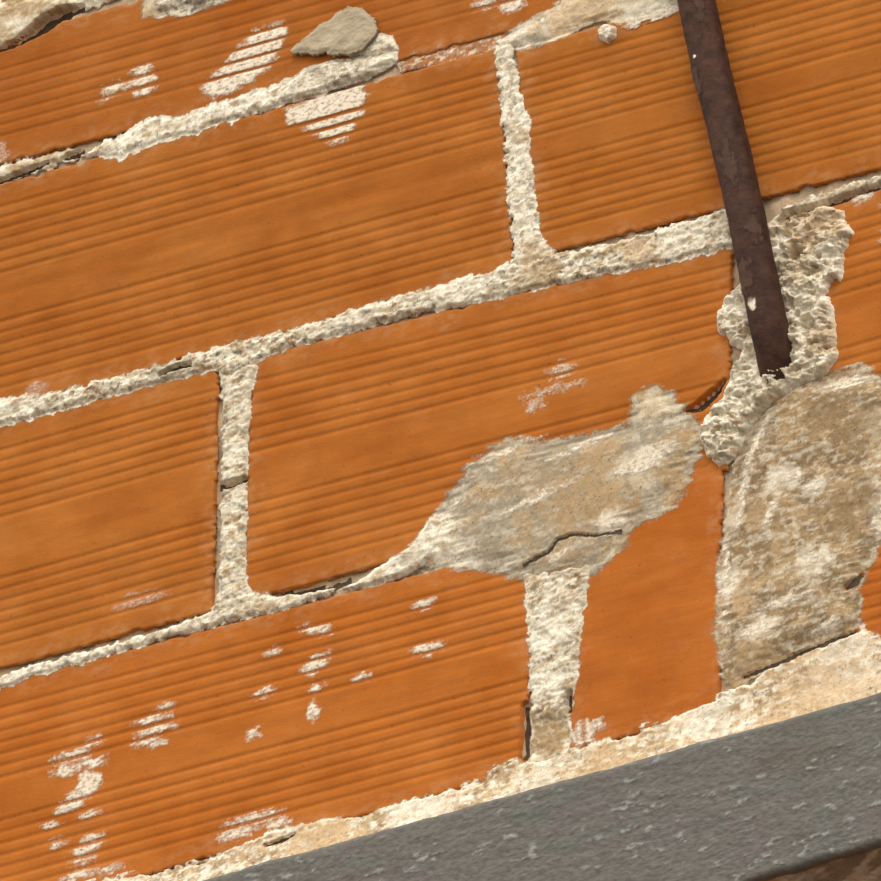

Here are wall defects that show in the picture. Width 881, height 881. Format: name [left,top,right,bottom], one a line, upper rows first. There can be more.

crack [0,7,85,52]
damp [103,64,157,100]
peeling [201,6,399,142]
corrosion [735,256,757,299]
spalling [686,206,854,467]
crack [523,529,622,567]
damp [301,653,330,691]
damp [413,643,443,657]
damp [131,702,176,747]
damp [43,734,104,829]
damp [217,808,292,842]
damp [60,834,119,881]